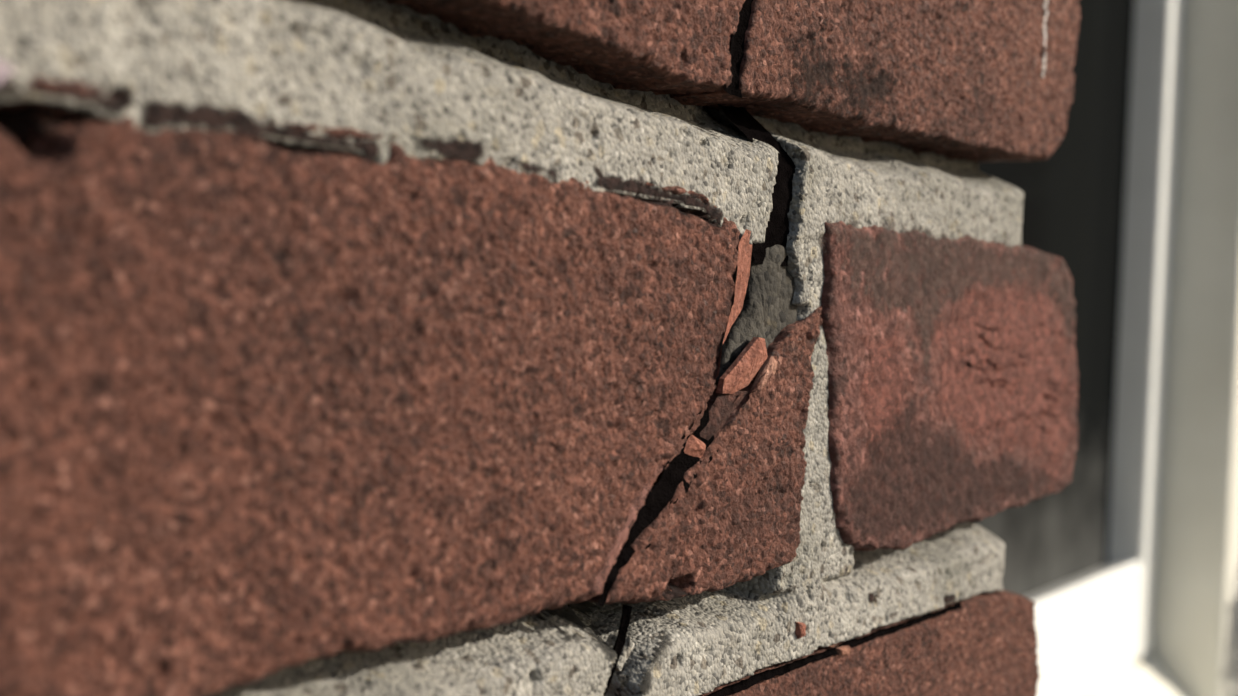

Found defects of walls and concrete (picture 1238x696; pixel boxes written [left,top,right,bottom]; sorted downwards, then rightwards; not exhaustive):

crack [568,0,797,696]
crack [708,602,963,696]